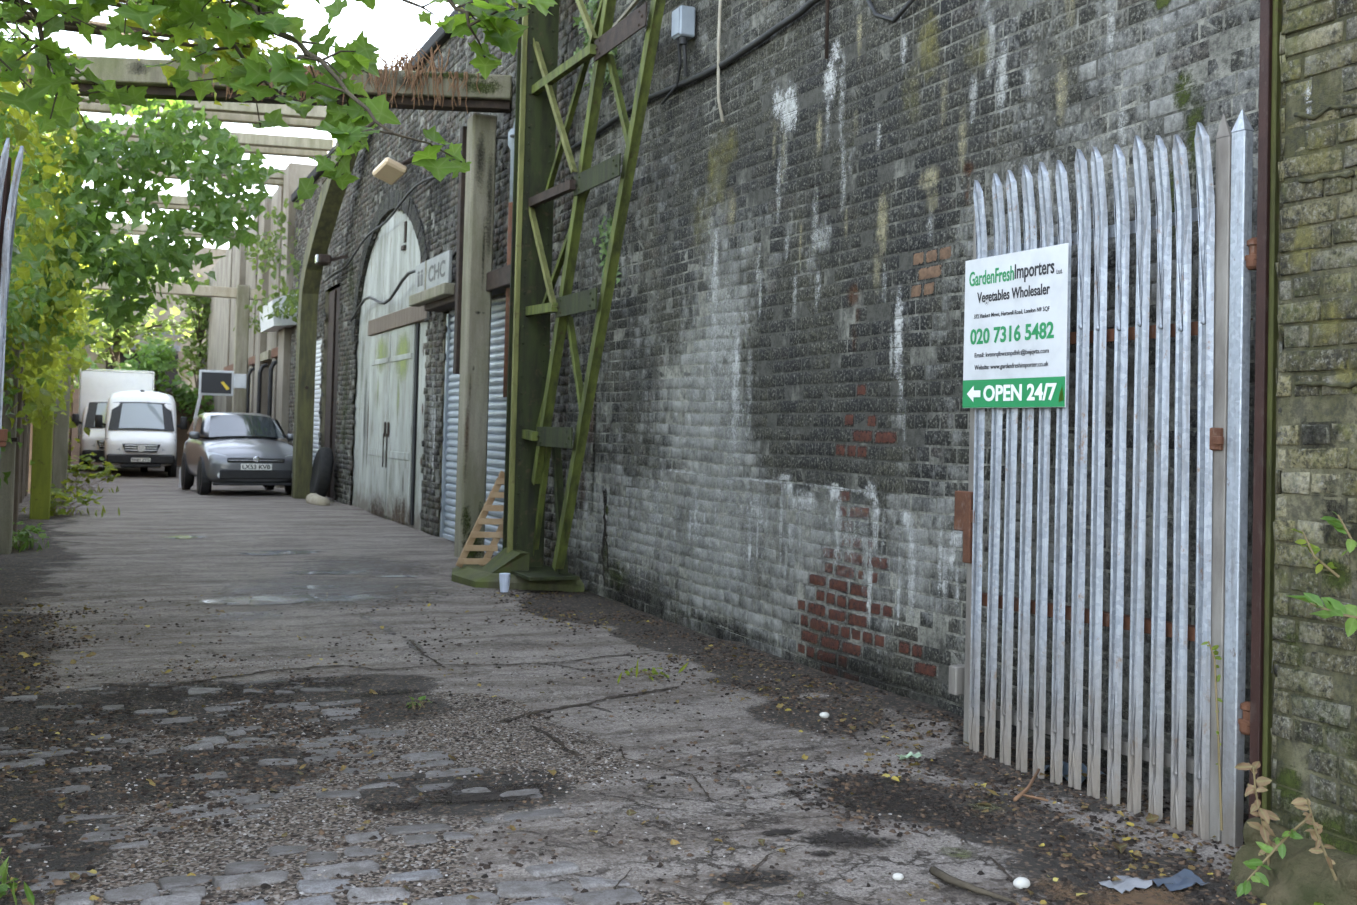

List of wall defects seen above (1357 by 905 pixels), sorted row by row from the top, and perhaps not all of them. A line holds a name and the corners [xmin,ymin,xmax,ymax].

damp [773,81,847,305]
damp [817,43,851,205]
damp [878,203,887,246]
spalling [603,474,937,682]
crack [102,640,679,758]
crack [620,745,782,816]